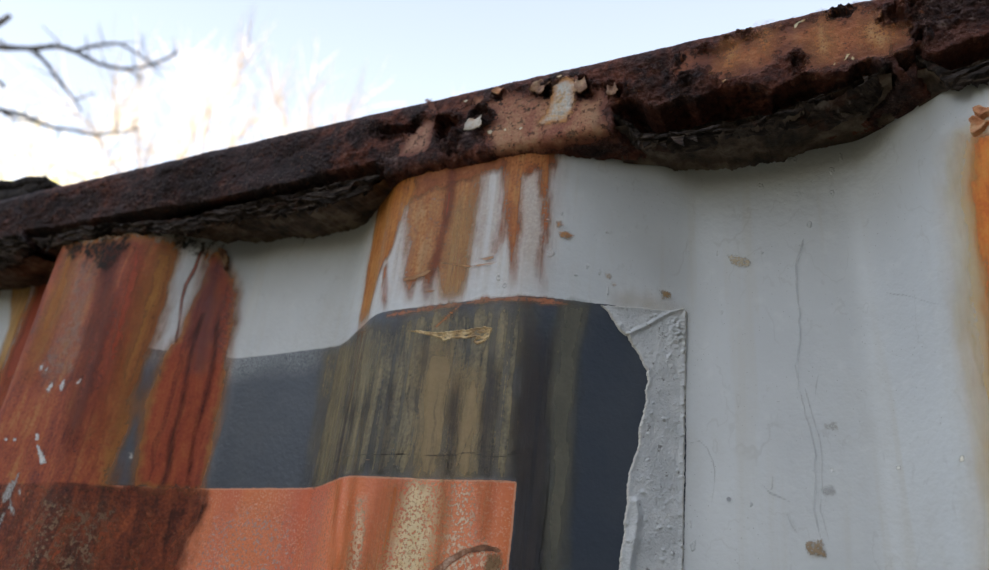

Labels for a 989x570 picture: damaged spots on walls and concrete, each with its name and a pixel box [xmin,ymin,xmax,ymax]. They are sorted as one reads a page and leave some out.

peeling [528,79,550,94]
peeling [574,76,588,93]
rust [916,54,989,107]
peeling [463,114,482,131]
rust [614,63,894,171]
rust [963,105,989,391]
spalling [408,306,492,345]
rust [0,153,567,570]
peeling [600,291,687,570]